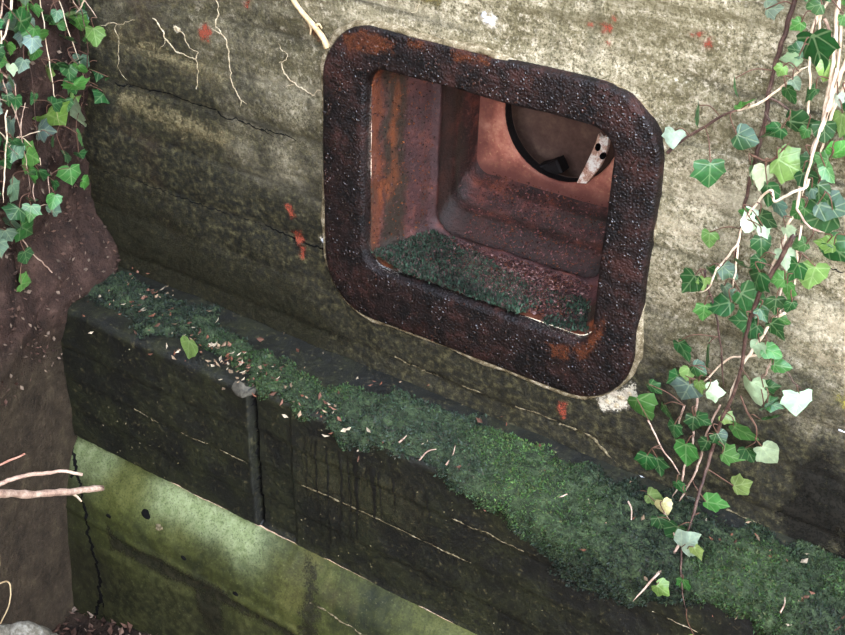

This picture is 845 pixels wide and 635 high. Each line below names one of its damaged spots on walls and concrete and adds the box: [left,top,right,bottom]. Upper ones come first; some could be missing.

crack [101,0,296,141]
rust [198,24,212,42]
crack [70,448,104,619]
water stain [303,437,382,555]